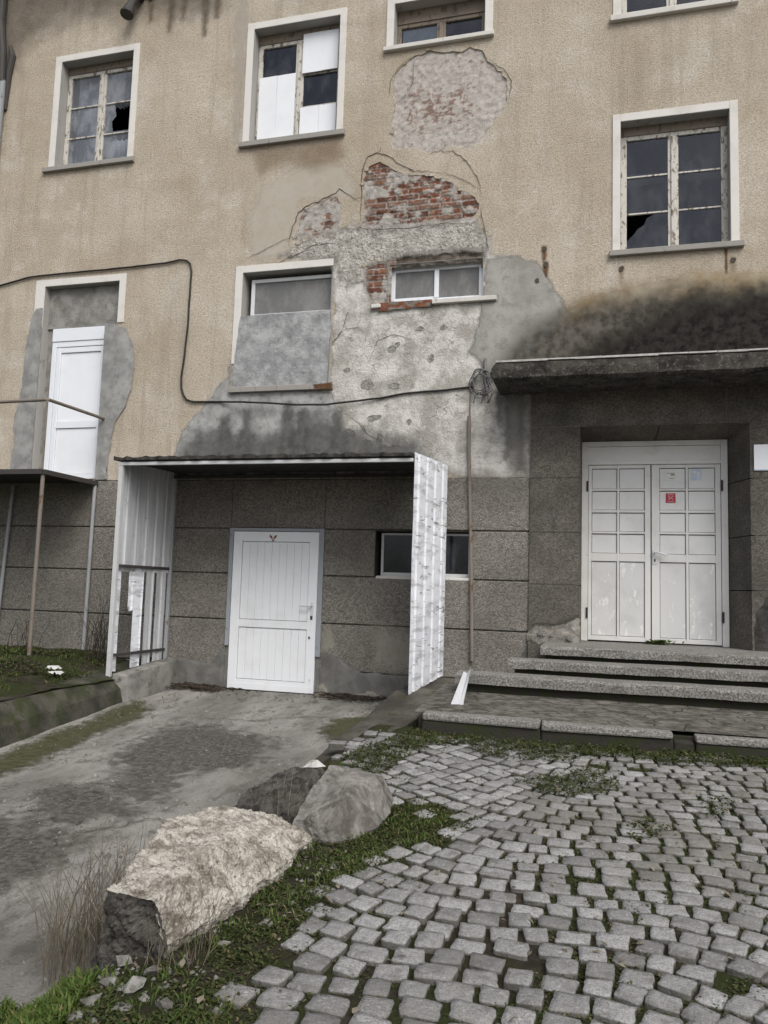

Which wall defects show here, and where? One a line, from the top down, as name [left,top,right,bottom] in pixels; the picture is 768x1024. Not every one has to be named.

spalling [390,47,508,153]
crack [247,146,492,263]
peeling [251,163,531,478]
rust [535,246,548,283]
water stain [509,273,768,361]
water stain [184,405,423,456]